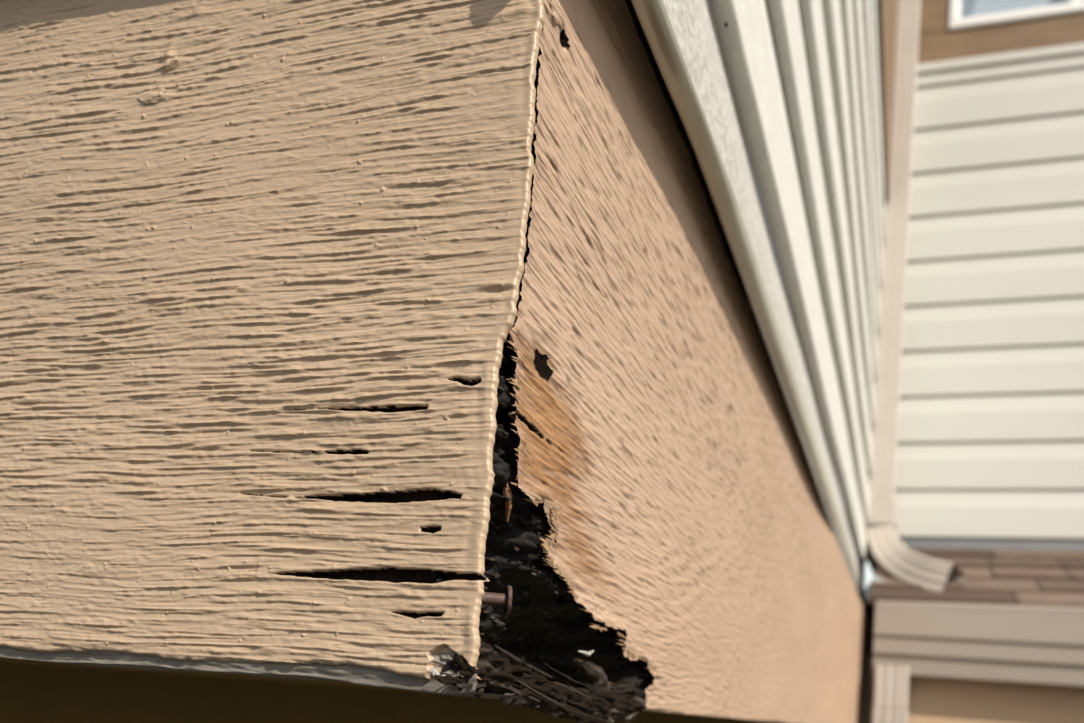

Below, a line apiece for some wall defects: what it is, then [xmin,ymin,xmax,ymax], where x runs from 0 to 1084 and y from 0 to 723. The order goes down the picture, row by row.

crack [294,405,428,413]
peeling [515,341,599,574]
crack [246,488,462,533]
crack [277,567,487,584]
crack [391,611,444,619]